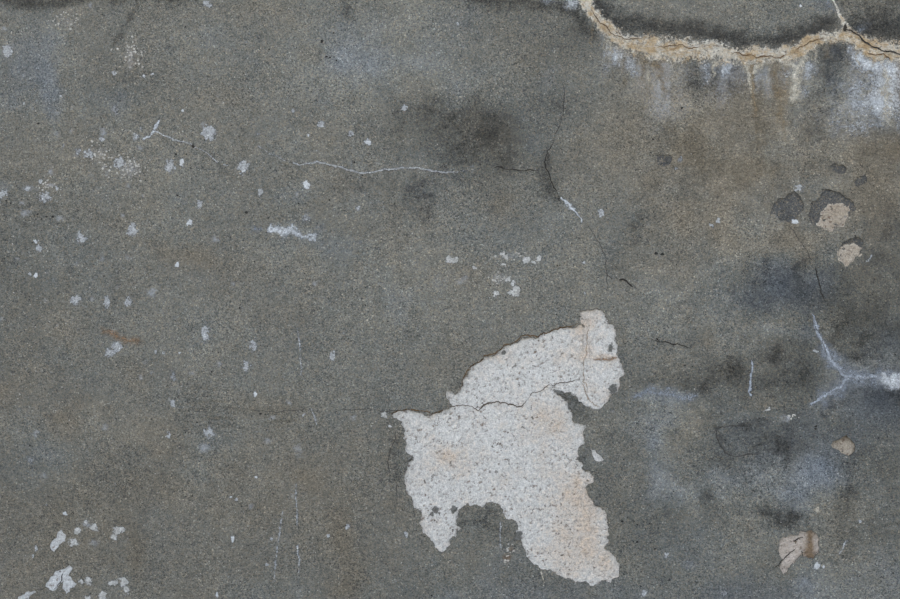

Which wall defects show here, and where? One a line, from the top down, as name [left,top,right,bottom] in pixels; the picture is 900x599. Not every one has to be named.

leakage [592,0,835,49]
crack [578,0,900,68]
leakage [849,14,900,40]
leakage [604,39,677,92]
leakage [704,45,900,142]
crack [258,85,632,291]
peeling [770,189,856,232]
peeling [837,237,864,266]
crack [787,225,900,406]
flaking render [381,308,625,586]
spalling [831,435,855,456]
spalling [774,530,825,574]